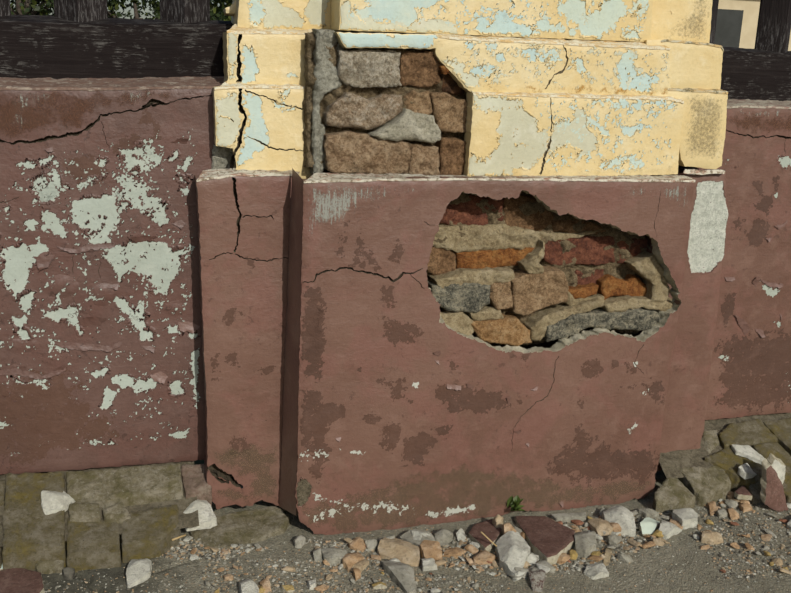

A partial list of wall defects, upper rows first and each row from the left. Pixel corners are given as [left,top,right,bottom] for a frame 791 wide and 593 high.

crack [0,95,213,146]
crack [209,34,304,262]
spalling [211,0,678,176]
crack [539,45,569,175]
crack [727,130,791,155]
spalling [687,155,791,275]
peeling [0,108,201,449]
crack [302,267,423,288]
spalling [424,191,673,362]
peeling [581,358,637,379]
leakage [306,493,409,522]
leakage [426,504,476,518]